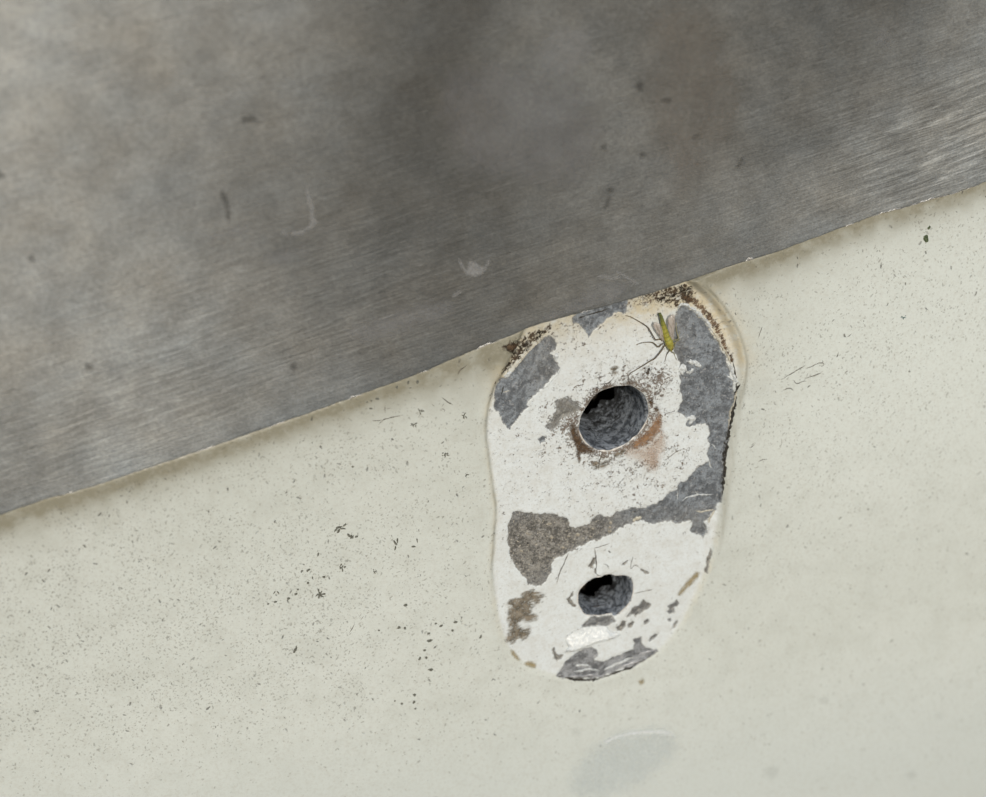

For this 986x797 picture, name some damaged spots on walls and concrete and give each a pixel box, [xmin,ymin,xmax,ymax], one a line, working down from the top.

peeling [494,335,561,430]
peeling [507,300,739,586]
rust [633,400,662,448]
peeling [552,599,658,681]